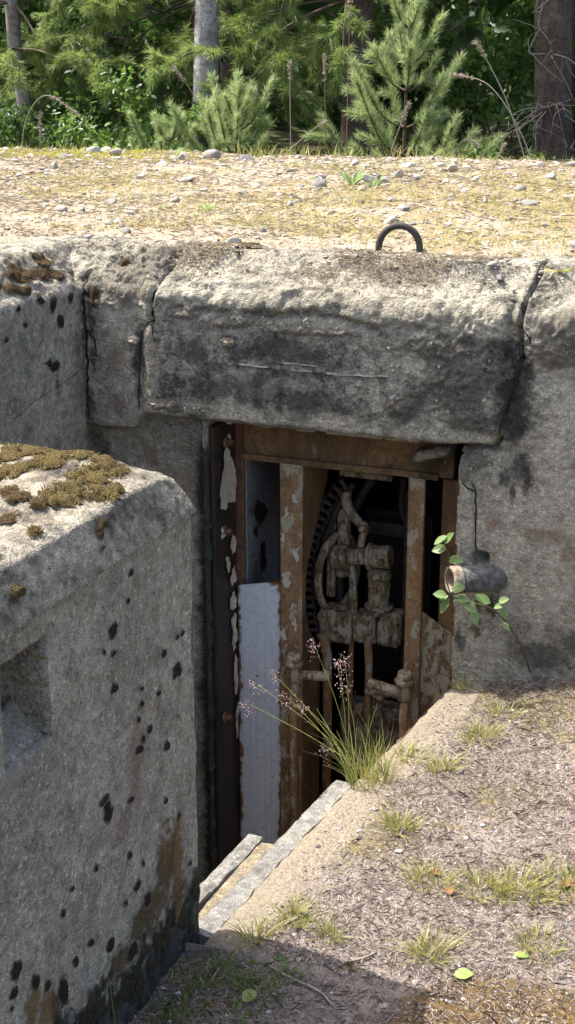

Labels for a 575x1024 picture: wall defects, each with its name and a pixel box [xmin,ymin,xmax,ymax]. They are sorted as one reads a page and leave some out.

crack [16,268,97,419]
crack [138,261,177,408]
crack [481,286,537,444]
peeling [220,434,237,510]
peeling [221,526,240,738]
peeling [253,498,268,575]
peeling [280,532,300,588]
damp [498,415,533,502]
corrosion [110,818,188,980]